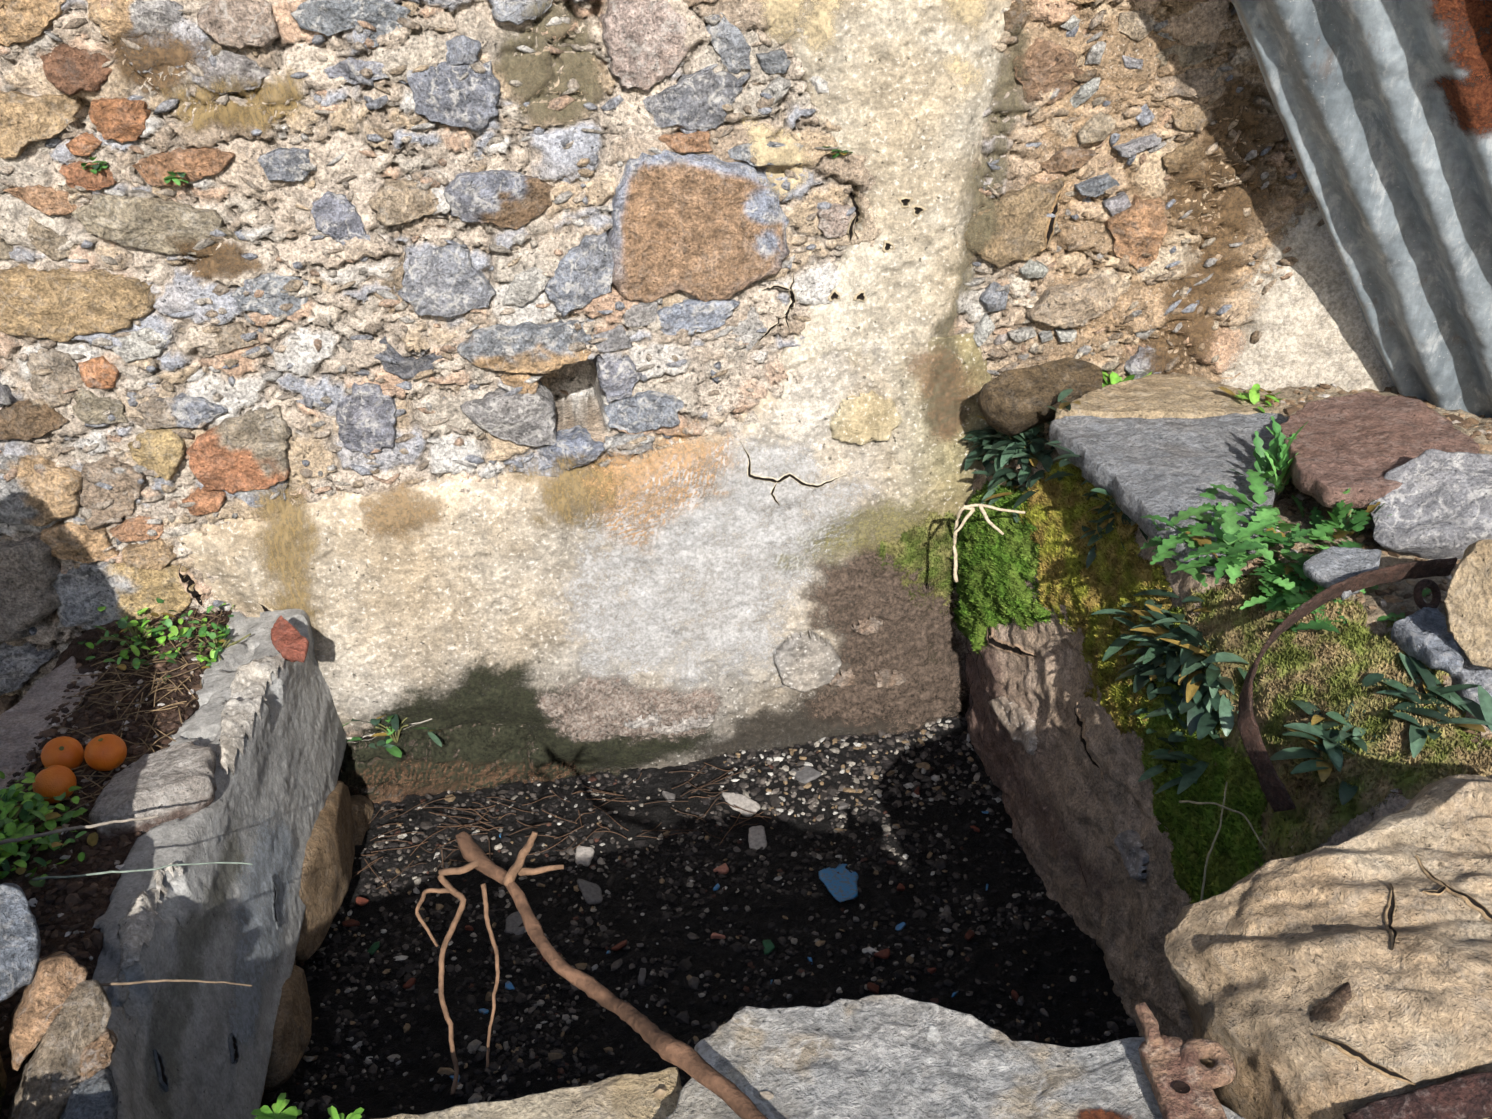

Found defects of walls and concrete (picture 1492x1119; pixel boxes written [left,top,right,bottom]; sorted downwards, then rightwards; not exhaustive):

rust [1430,0,1492,135]
crack [740,441,847,506]
water stain [338,758,582,804]